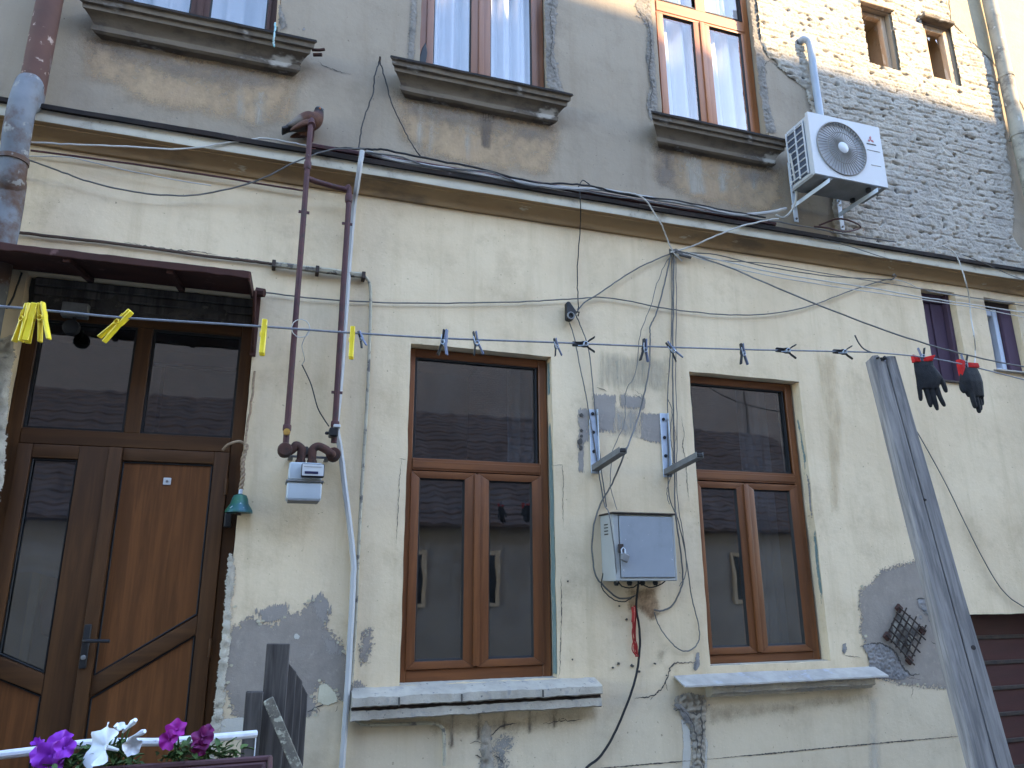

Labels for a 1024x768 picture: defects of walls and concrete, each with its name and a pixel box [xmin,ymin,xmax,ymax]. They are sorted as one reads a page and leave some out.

water stain [87,40,292,125]
flaking render [577,393,661,473]
peeling [209,553,365,759]
peeling [358,627,376,667]
peeling [858,559,946,690]
flaking render [673,692,710,768]